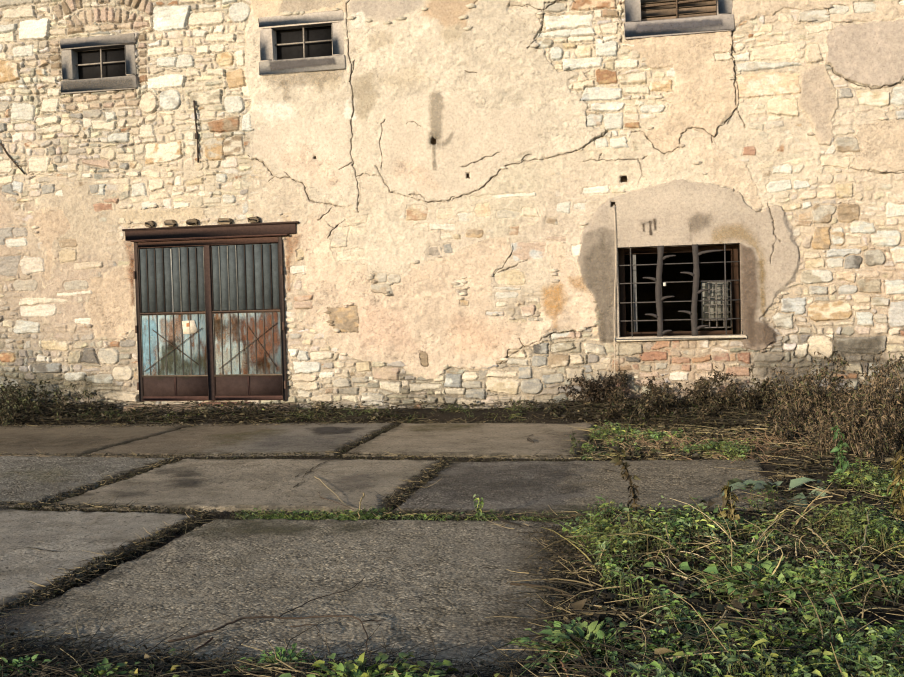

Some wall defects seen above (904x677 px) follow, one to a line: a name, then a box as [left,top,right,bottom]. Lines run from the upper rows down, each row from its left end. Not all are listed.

water stain [431,93,442,167]
flaking render [0,0,904,410]
crack [248,0,745,237]